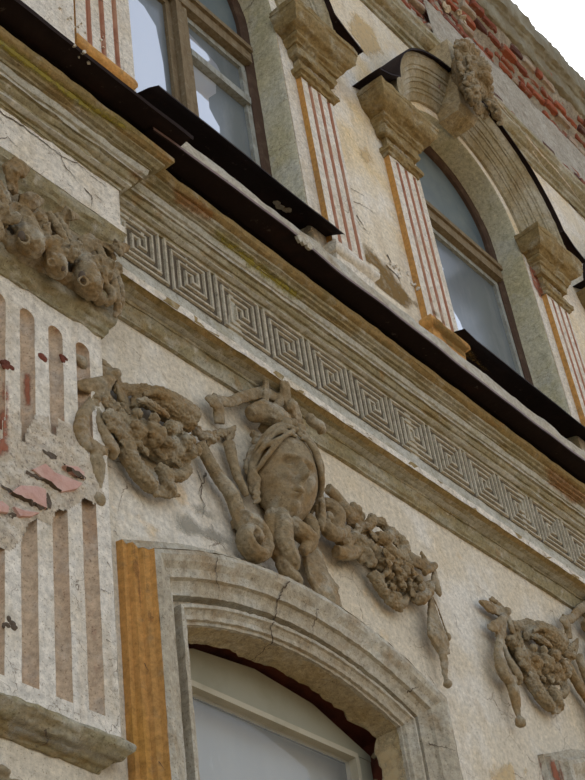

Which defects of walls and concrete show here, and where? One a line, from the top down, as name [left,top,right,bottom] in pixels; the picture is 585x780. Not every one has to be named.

peeling [350,14,381,55]
flaking render [401,0,585,156]
spalling [526,135,585,208]
spalling [0,359,14,371]
spalling [0,411,104,552]
crack [252,581,290,660]